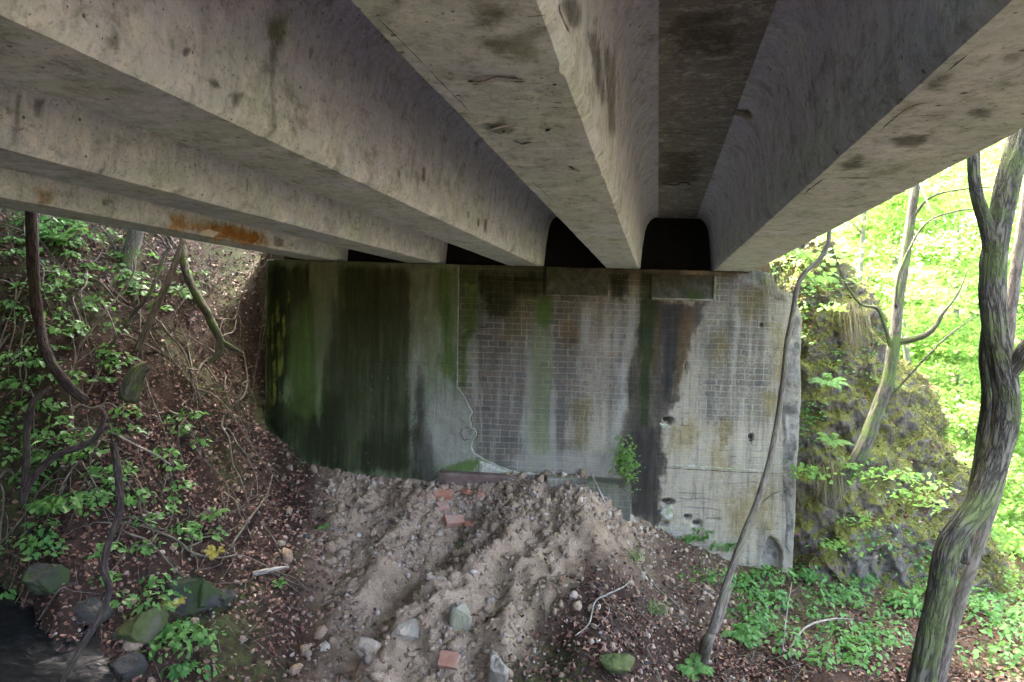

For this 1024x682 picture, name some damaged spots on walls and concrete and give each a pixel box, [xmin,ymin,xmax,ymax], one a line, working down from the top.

corrosion [169,214,267,246]
water stain [300,262,335,416]
water stain [409,267,482,482]
water stain [505,294,704,527]